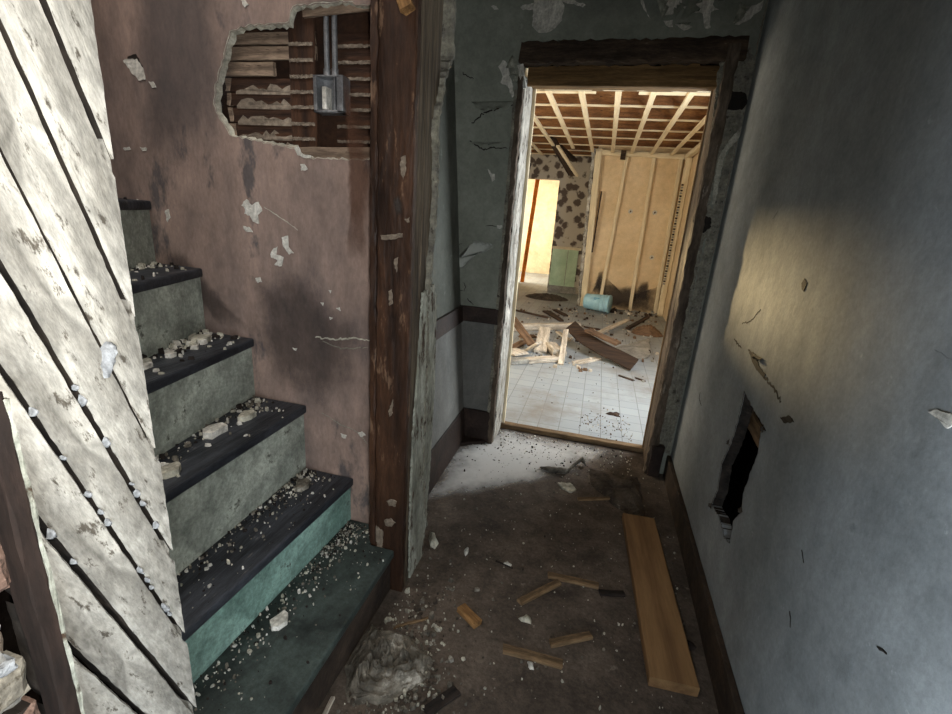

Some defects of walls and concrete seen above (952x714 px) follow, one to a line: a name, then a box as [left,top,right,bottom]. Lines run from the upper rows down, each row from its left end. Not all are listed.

spalling [213,0,370,170]
peeling [521,0,585,33]
peeling [641,0,722,31]
spalling [660,44,756,454]
crack [315,336,370,349]
spalling [708,391,765,544]